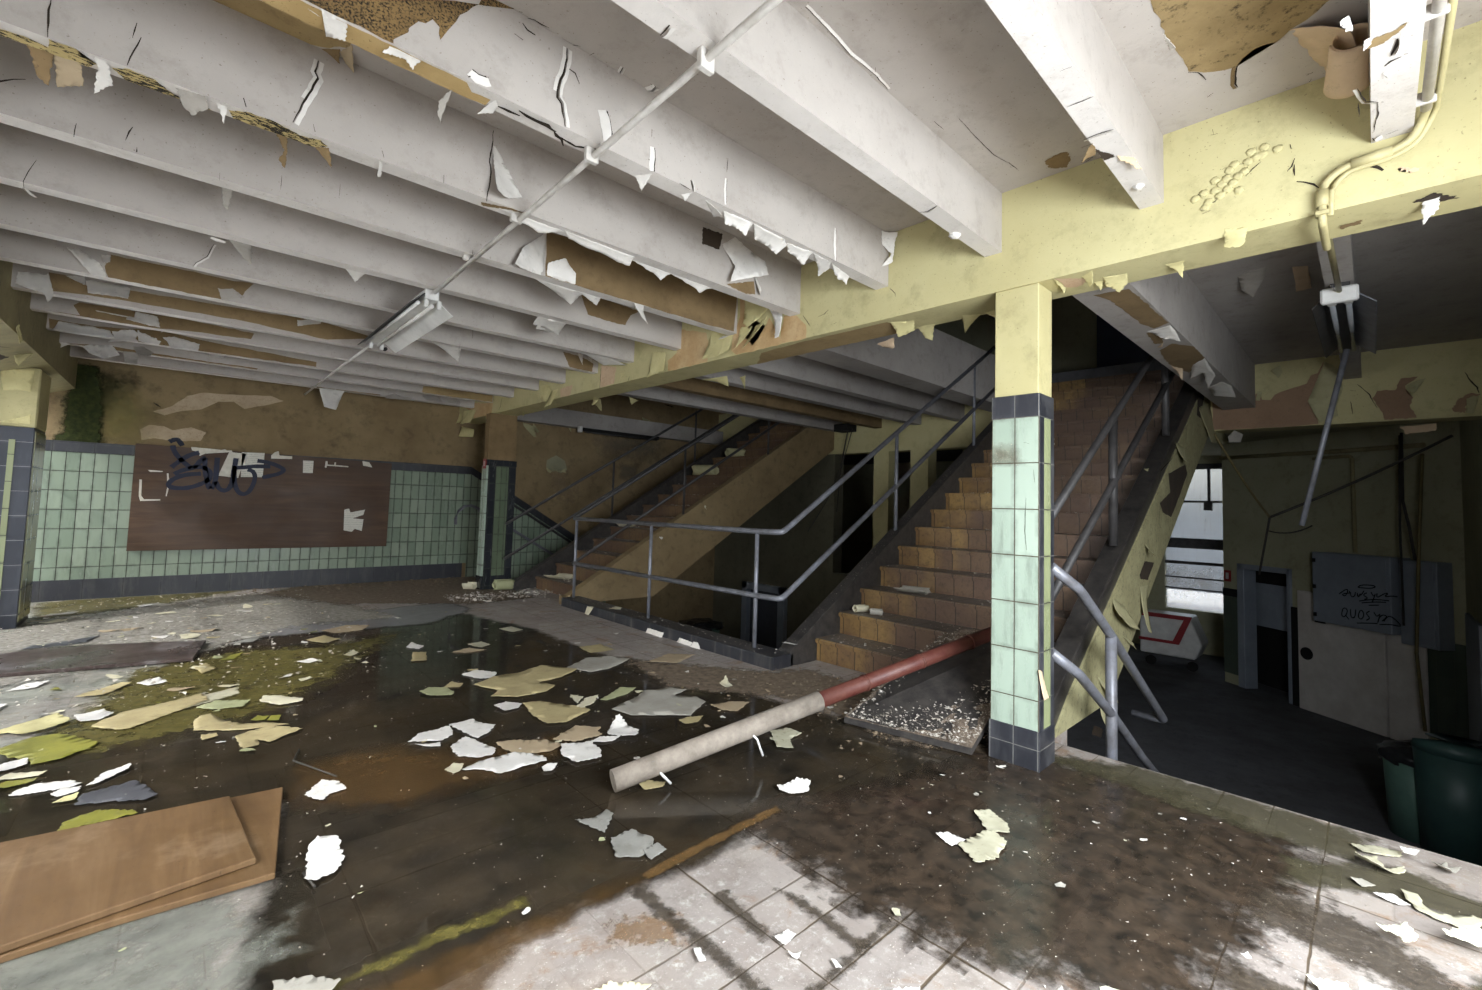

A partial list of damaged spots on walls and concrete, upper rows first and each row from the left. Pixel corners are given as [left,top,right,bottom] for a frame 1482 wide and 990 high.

peeling [0,29,332,168]
crack [293,59,324,130]
crack [511,7,659,141]
crack [660,25,676,39]
peeling [1150,0,1408,99]
peeling [635,174,652,191]
crack [648,146,728,205]
peeling [15,247,493,441]
peeling [481,193,935,389]
peeling [1052,266,1343,444]
peeling [1372,377,1437,434]
peeling [1113,544,1156,650]